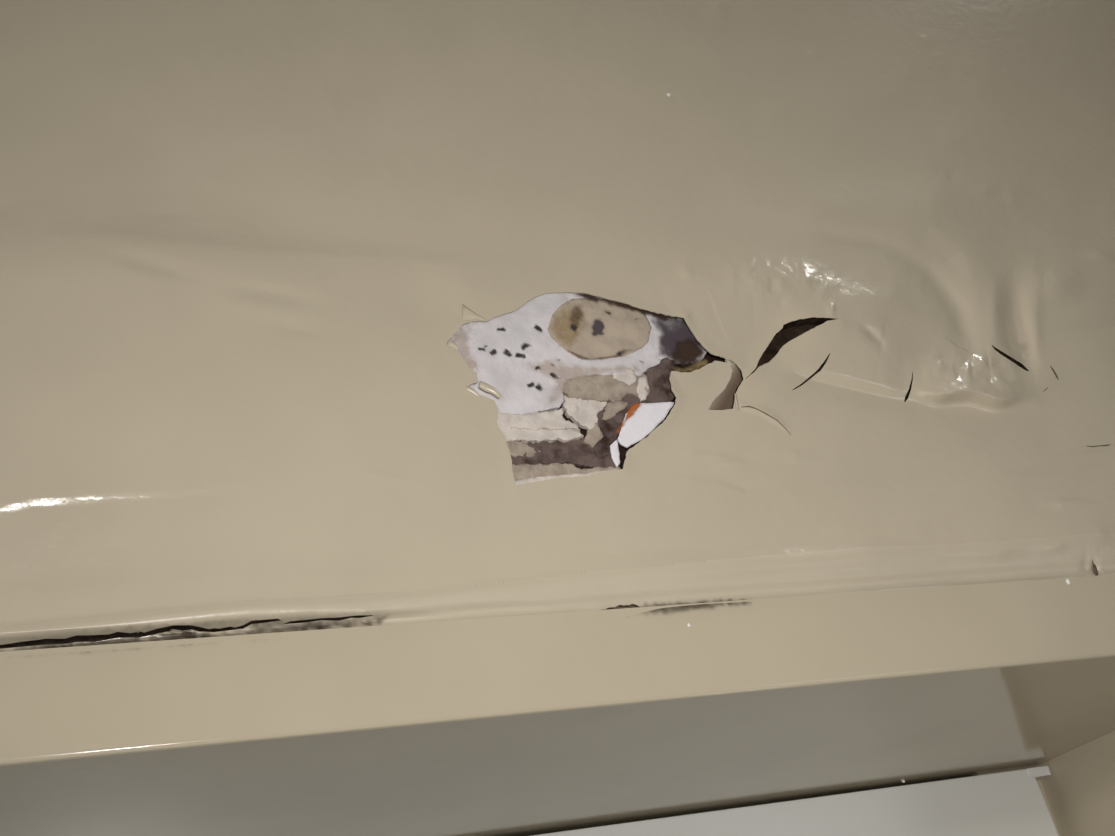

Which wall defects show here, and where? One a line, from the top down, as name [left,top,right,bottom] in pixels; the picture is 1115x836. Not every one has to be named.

peeling [447,292,910,485]
crack [708,317,835,435]
crack [904,373,913,402]
crack [992,345,1059,392]
crack [0,615,373,649]